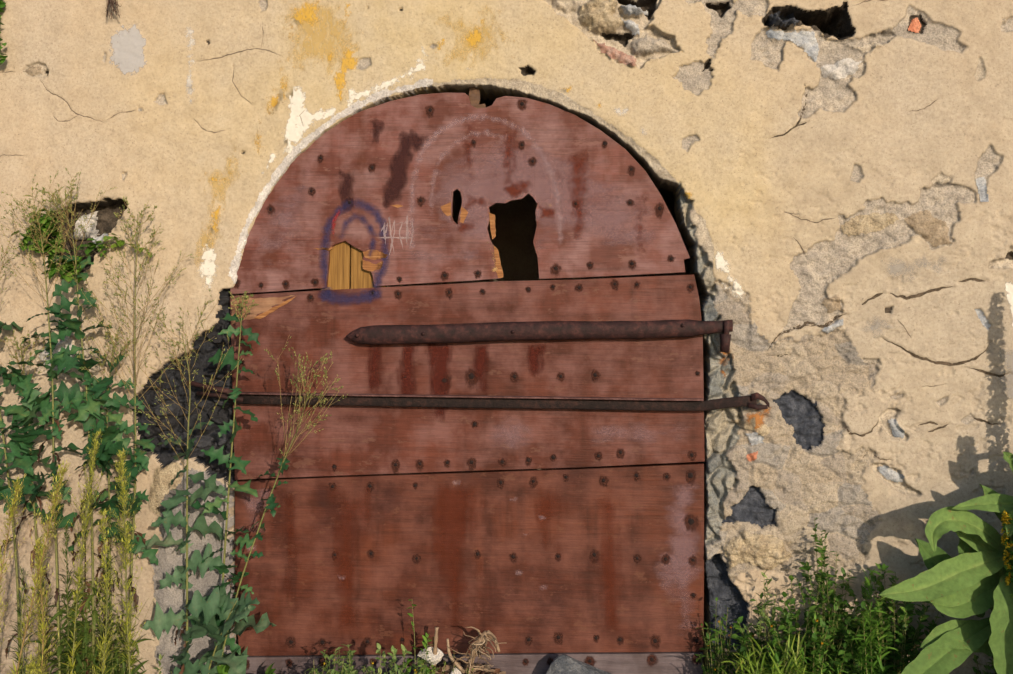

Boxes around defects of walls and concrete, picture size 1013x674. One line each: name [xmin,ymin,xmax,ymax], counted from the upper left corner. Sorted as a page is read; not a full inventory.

crack [202,27,281,102]
leakage [347,51,426,106]
spalling [543,0,680,69]
spalling [673,0,967,118]
leakage [266,86,336,168]
rust [340,174,351,210]
rust [384,134,422,207]
spalling [989,245,1013,268]
rust [428,344,449,415]
spalling [132,77,1002,650]
crack [767,278,1008,387]
crack [920,421,948,432]